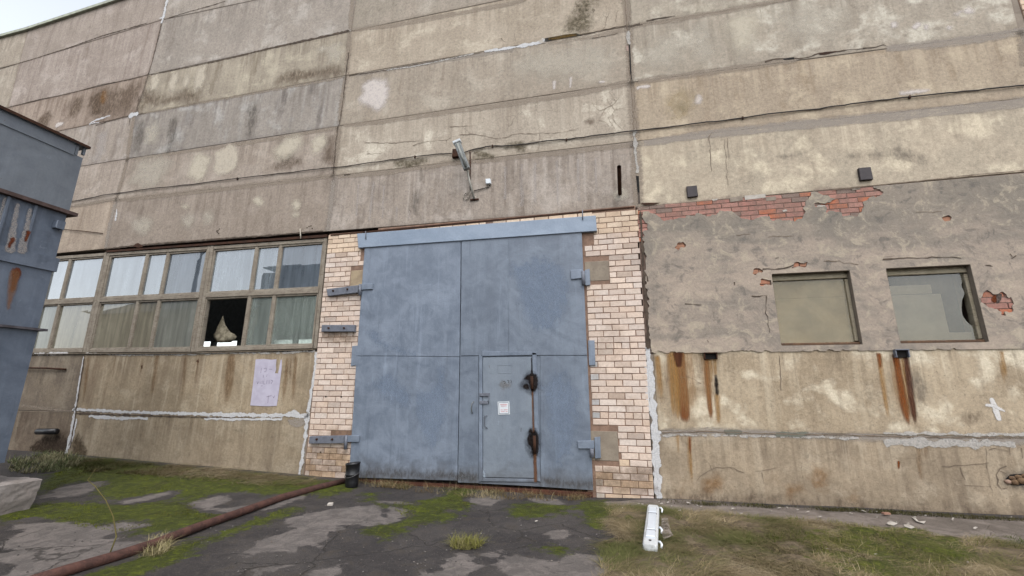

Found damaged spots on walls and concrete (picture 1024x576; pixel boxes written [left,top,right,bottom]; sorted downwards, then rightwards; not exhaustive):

leakage [568,0,589,34]
leakage [70,87,194,115]
crack [366,93,623,154]
spalling [637,186,883,242]
corrosion [8,268,21,308]
spalling [981,290,1013,316]
corrosion [655,352,690,421]
corrosion [704,359,720,421]
corrosion [877,353,916,421]
spalling [1004,474,1024,486]